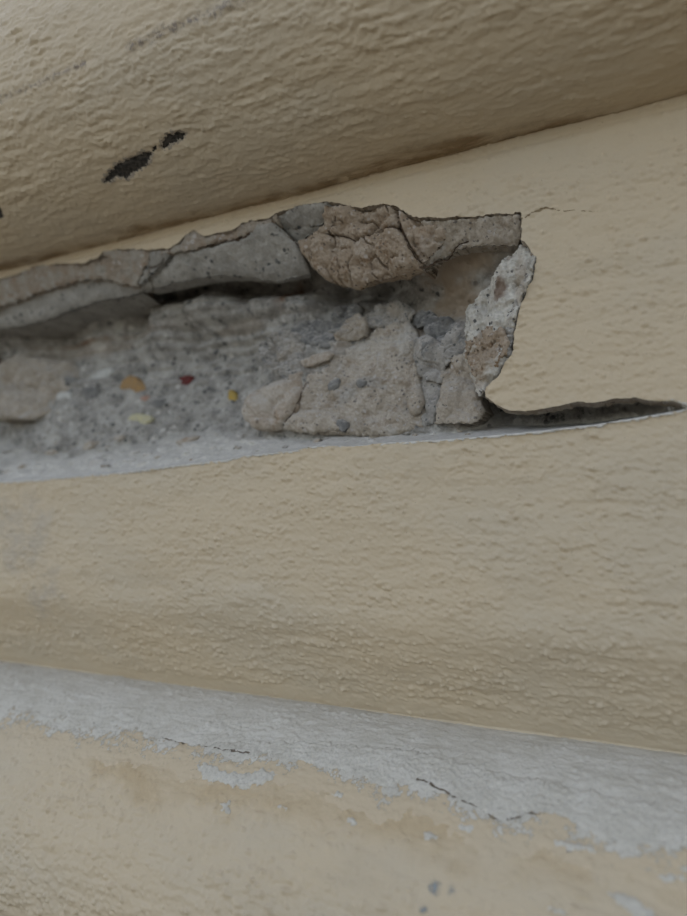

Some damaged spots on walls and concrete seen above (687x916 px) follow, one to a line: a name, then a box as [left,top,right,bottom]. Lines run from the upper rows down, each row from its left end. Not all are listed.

spalling [0,201,687,484]
peeling [197,762,278,790]
crack [416,778,541,822]